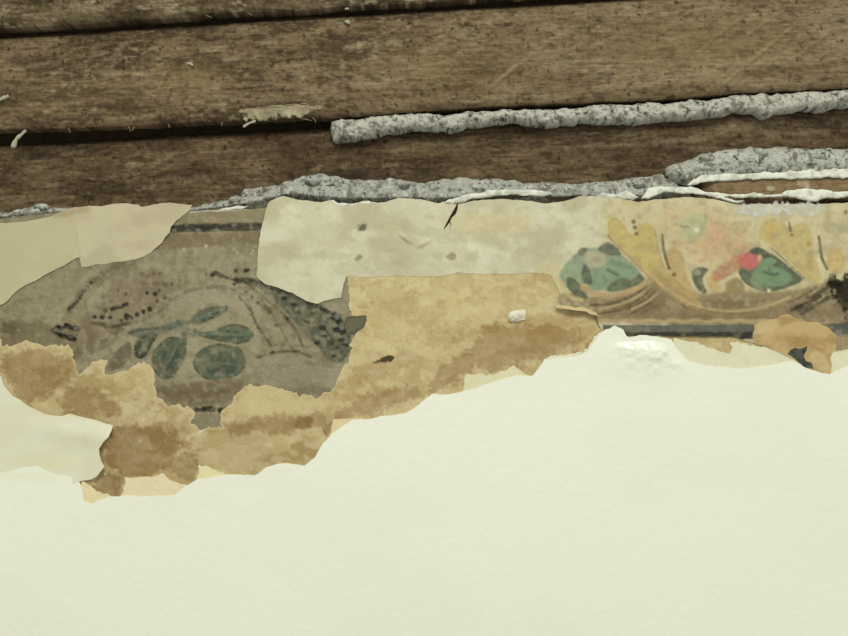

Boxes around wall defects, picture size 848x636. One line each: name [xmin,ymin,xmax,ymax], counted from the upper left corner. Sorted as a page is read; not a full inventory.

flaking render [189,146,848,211]
flaking render [0,203,71,219]
crack [444,204,458,229]
peeling [753,314,837,374]
peeling [0,377,113,485]